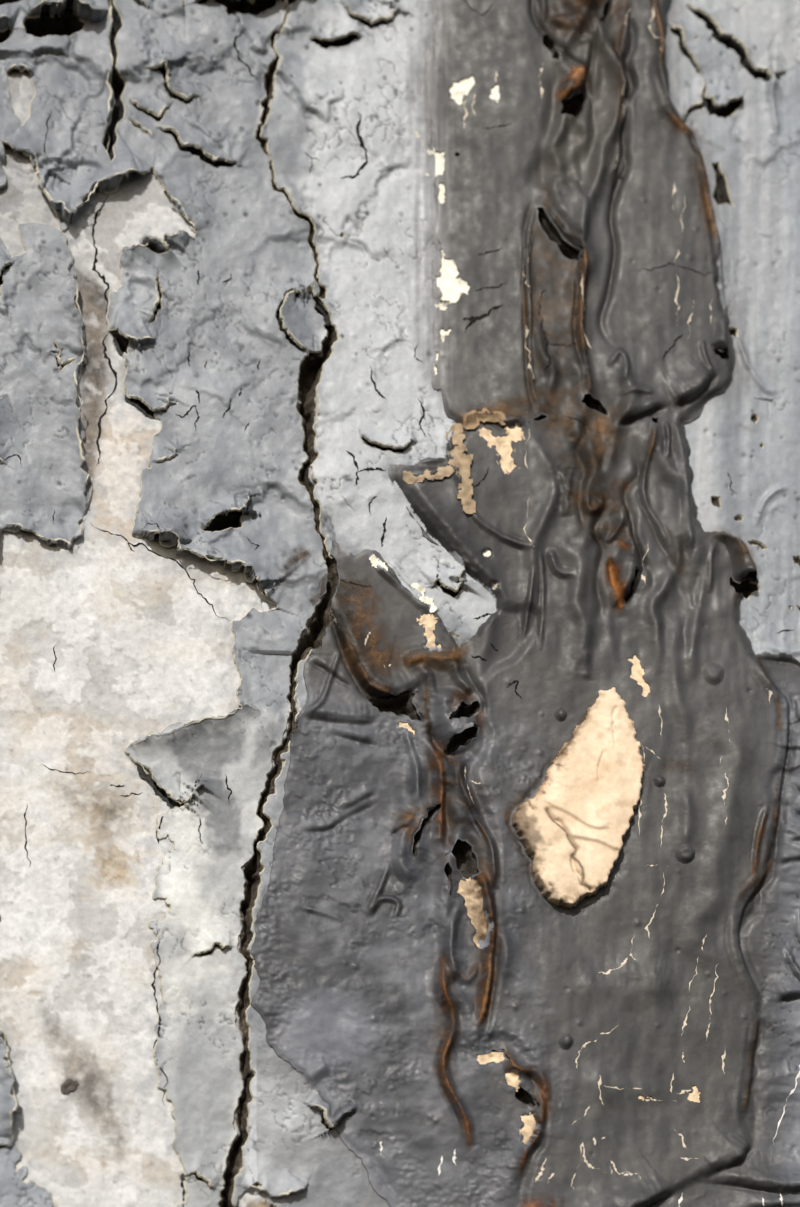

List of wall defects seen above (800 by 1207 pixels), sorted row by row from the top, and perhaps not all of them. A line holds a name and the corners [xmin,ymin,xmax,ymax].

rust [558,67,586,100]
peeling [667,0,800,123]
rust [668,113,716,236]
crack [92,196,117,466]
peeling [359,408,525,514]
peeling [0,0,316,1207]
crack [89,522,228,620]
crack [192,0,391,1207]
rust [608,559,625,609]
rust [423,687,495,1023]
spalling [512,687,645,908]
crack [151,931,168,1104]